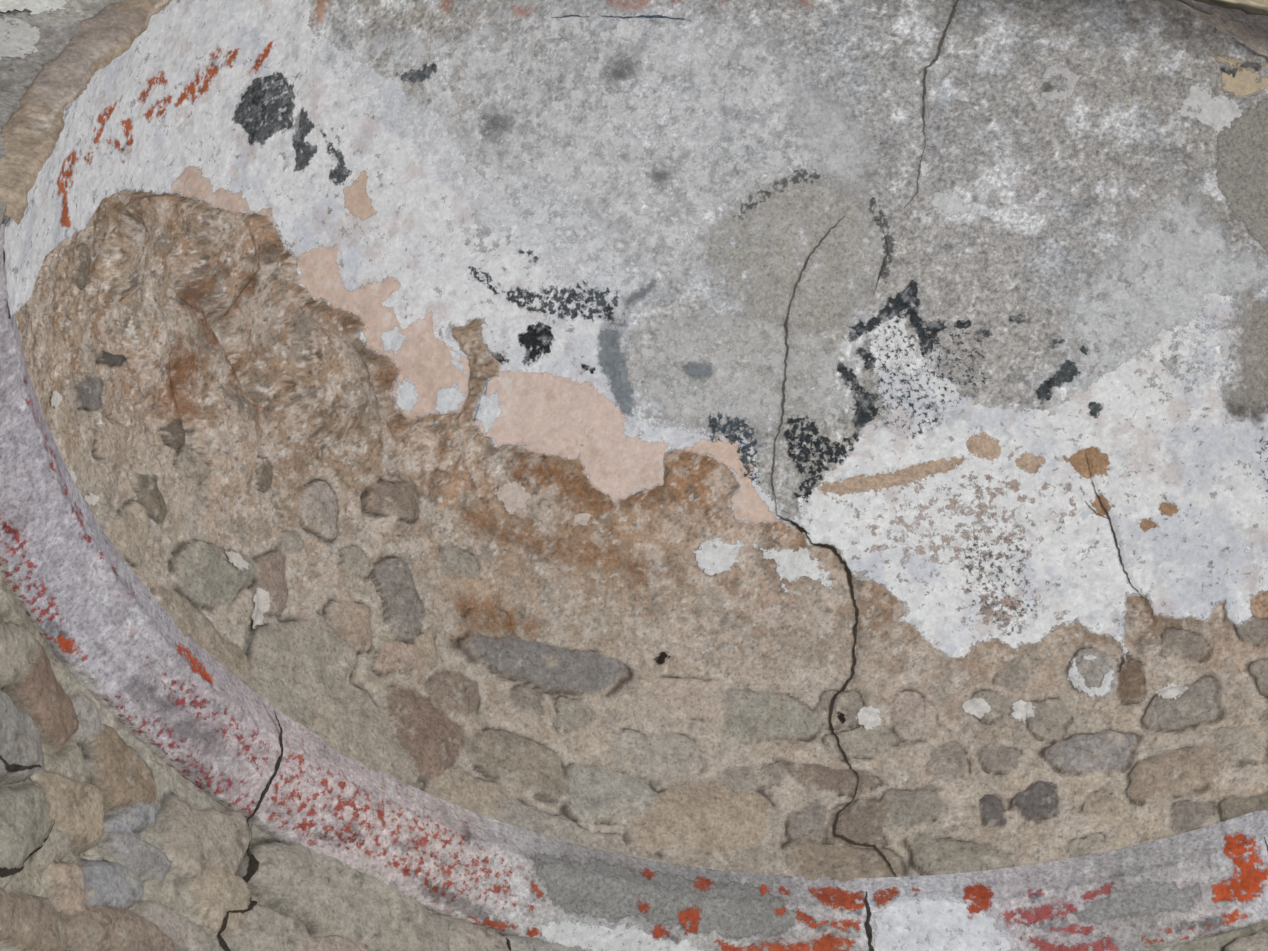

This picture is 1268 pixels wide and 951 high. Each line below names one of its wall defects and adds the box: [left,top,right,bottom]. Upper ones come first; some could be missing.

peeling [0,0,69,60]
crack [904,0,959,208]
peeling [1176,54,1268,135]
corrosion [57,98,133,228]
peeling [818,457,963,496]
peeling [1064,446,1110,479]
crack [771,214,897,877]
crack [217,711,284,951]
corrosion [716,884,920,951]
crack [864,891,874,951]
corrosion [963,882,1118,951]
corrosion [1142,832,1268,948]